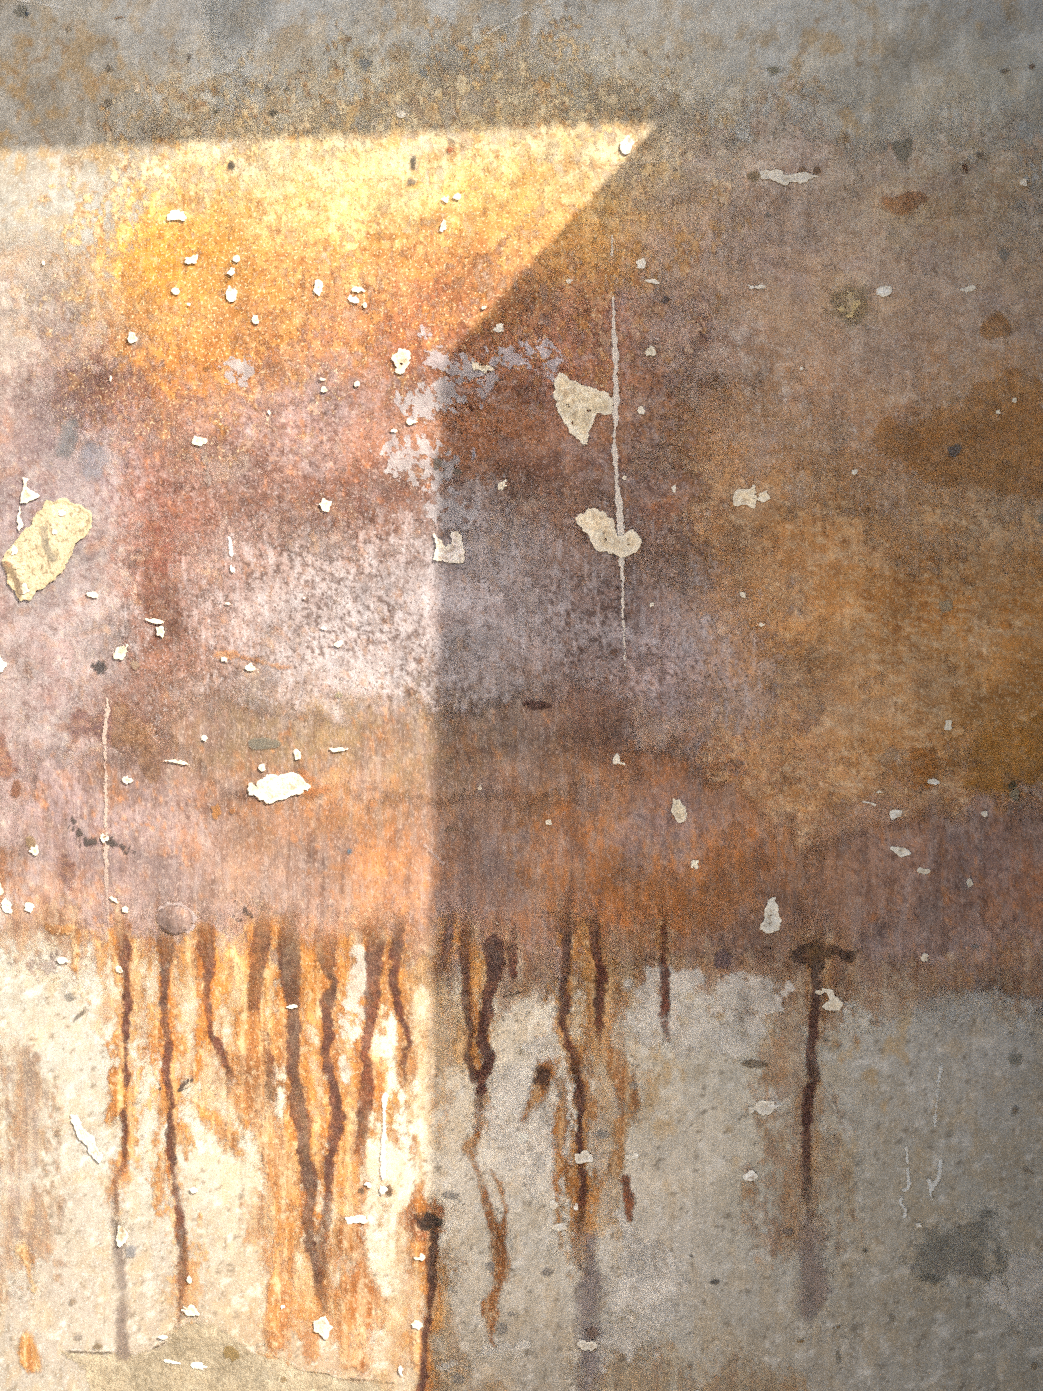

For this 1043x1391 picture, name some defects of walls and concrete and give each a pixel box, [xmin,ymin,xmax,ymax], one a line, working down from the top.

spalling [391,348,411,374]
spalling [553,373,613,446]
crack [611,296,626,666]
spalling [1,477,92,601]
spalling [433,531,465,564]
spalling [575,508,642,557]
spalling [247,749,328,804]
rust [522,1056,561,1120]
rust [620,1175,634,1222]
rust [333,1219,387,1372]
rust [399,1135,447,1391]
rust [462,1132,511,1347]